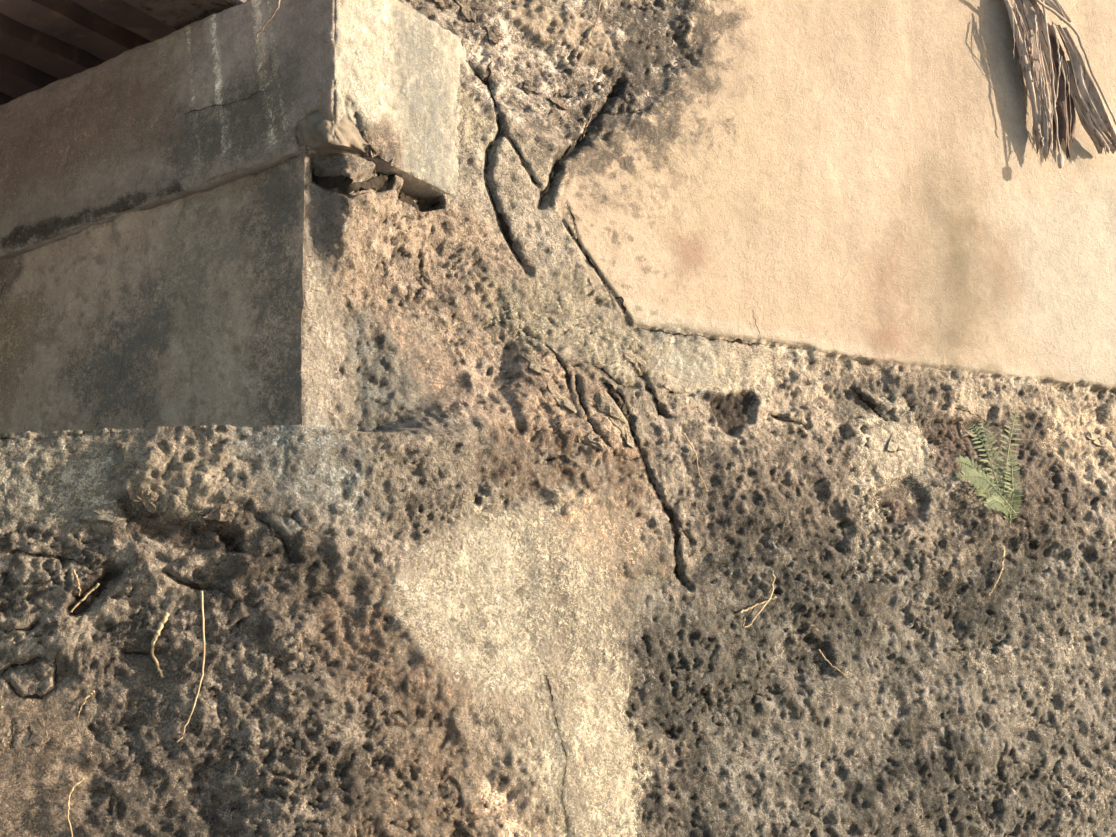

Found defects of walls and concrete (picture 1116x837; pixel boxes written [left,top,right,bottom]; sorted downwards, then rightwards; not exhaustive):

water stain [65,0,461,529]
spalling [296,111,404,168]
crack [466,60,774,346]
water stain [541,0,741,187]
crack [520,328,693,587]
water stain [829,370,940,433]
crack [1,653,57,747]
crack [0,548,89,569]
spalling [600,389,1116,837]